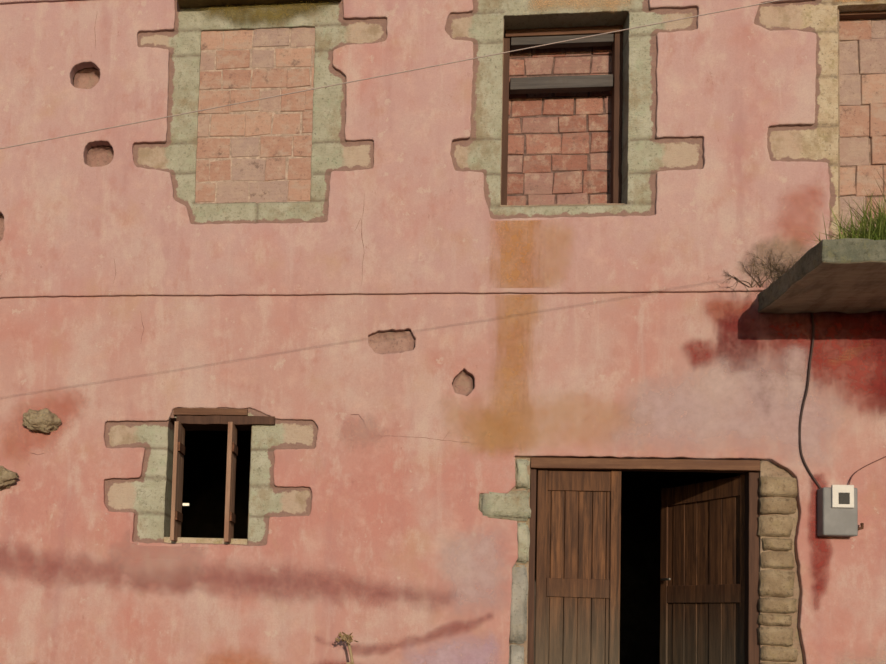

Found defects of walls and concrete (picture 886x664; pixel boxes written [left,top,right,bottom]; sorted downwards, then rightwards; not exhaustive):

hole [368,331,415,354]
hole [453,371,473,396]
damp [633,305,886,454]